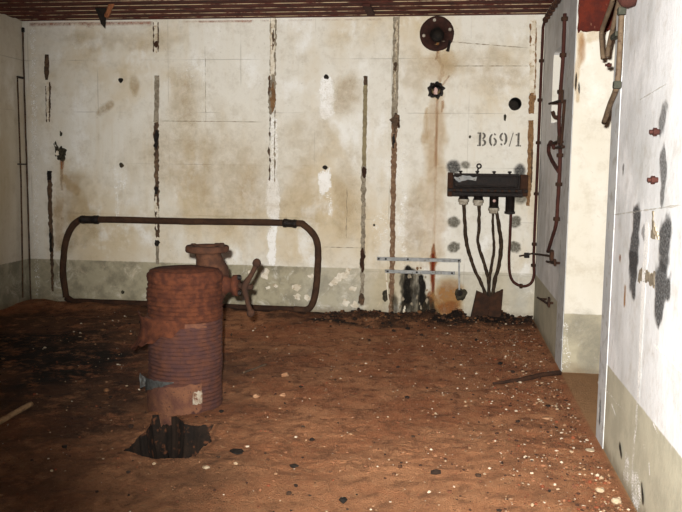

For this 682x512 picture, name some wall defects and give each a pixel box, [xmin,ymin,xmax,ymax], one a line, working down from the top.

damp [318,75,336,120]
spalling [53,131,67,176]
damp [264,117,281,266]
damp [317,167,333,215]
corrosion [427,244,441,314]